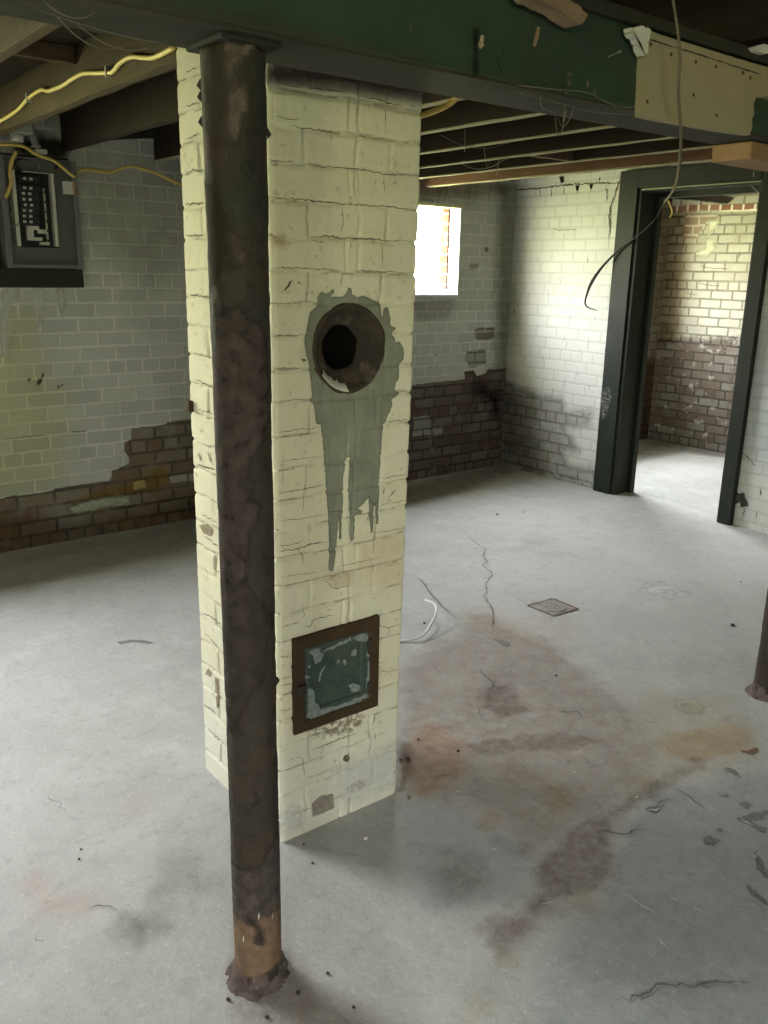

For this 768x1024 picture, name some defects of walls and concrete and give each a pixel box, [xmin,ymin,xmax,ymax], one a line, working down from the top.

rust [222,42,255,142]
rust [204,181,226,287]
crack [269,83,414,287]
peeling [639,195,758,453]
peeling [406,328,611,488]
peeling [0,419,213,553]
rust [213,304,273,732]
crack [464,518,495,631]
rust [230,824,282,979]
crack [617,980,748,1001]